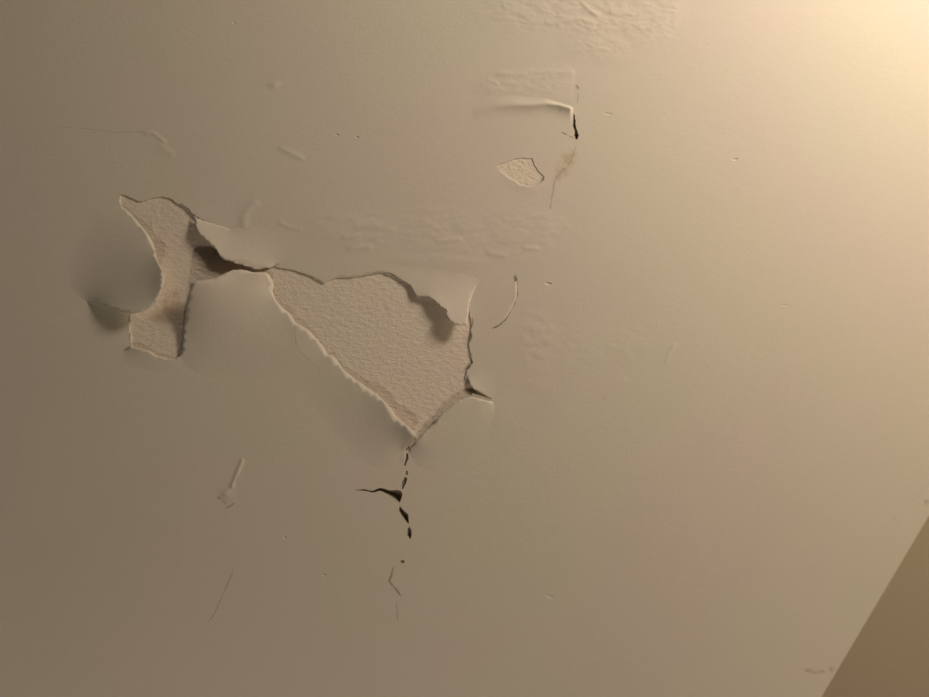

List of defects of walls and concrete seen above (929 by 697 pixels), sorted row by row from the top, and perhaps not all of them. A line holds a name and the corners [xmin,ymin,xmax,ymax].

peeling [496,158,545,195]
peeling [67,194,503,471]
crack [358,439,416,539]